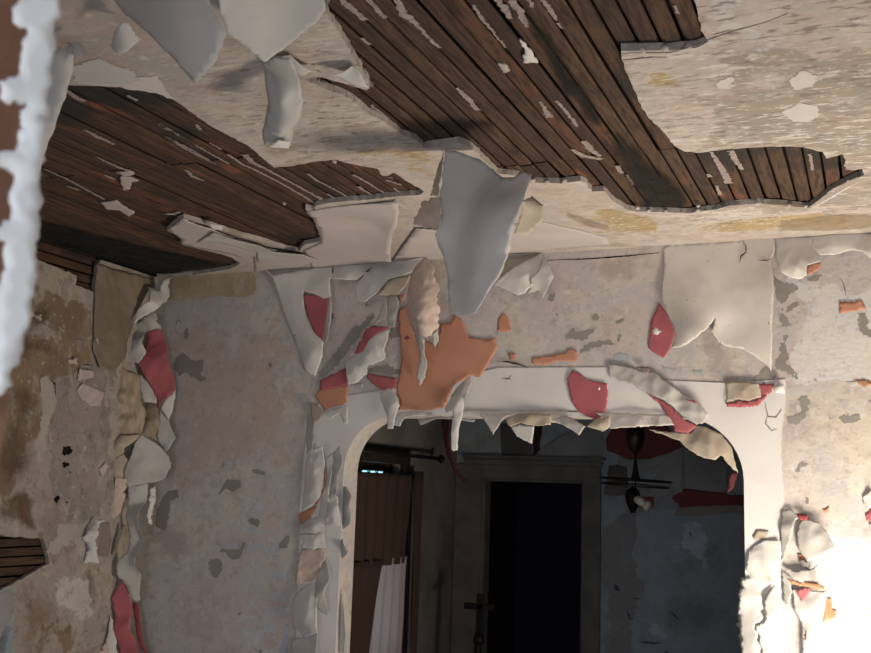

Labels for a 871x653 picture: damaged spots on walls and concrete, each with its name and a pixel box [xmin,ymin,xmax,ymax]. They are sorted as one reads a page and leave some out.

flaking render [317,0,862,214]
flaking render [0,0,421,406]
water stain [29,311,47,327]
flaking render [565,314,629,363]
flaking render [751,276,799,381]
flaking render [857,313,871,338]
water stain [34,375,57,469]
flaking render [787,396,810,425]
flaking render [829,414,861,424]
flaking render [62,446,73,473]
water stain [4,493,33,527]
flaking render [0,536,45,586]